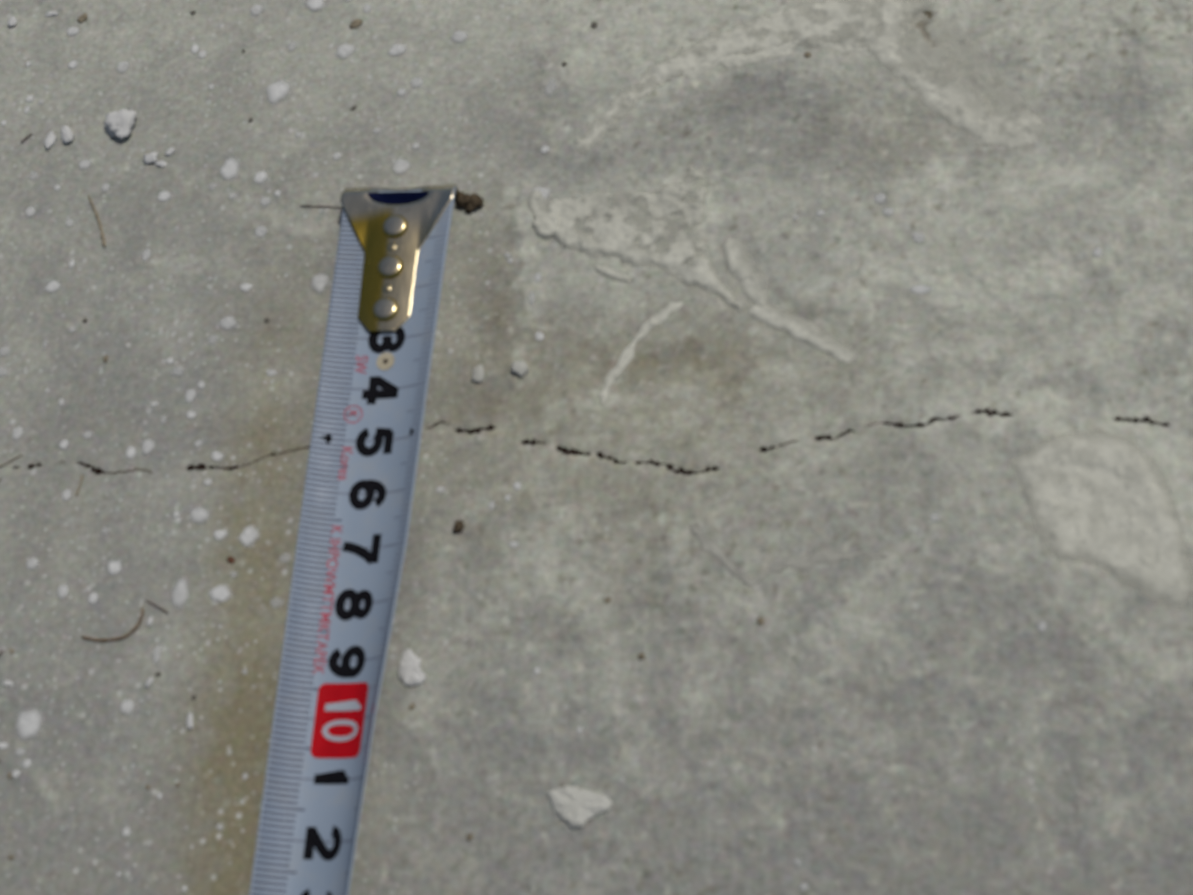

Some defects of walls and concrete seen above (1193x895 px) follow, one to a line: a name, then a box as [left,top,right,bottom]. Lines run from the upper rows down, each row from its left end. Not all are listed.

crack [760,408,1013,452]
crack [1114,416,1170,426]
crack [0,460,153,481]
crack [186,445,310,471]
crack [425,421,720,475]